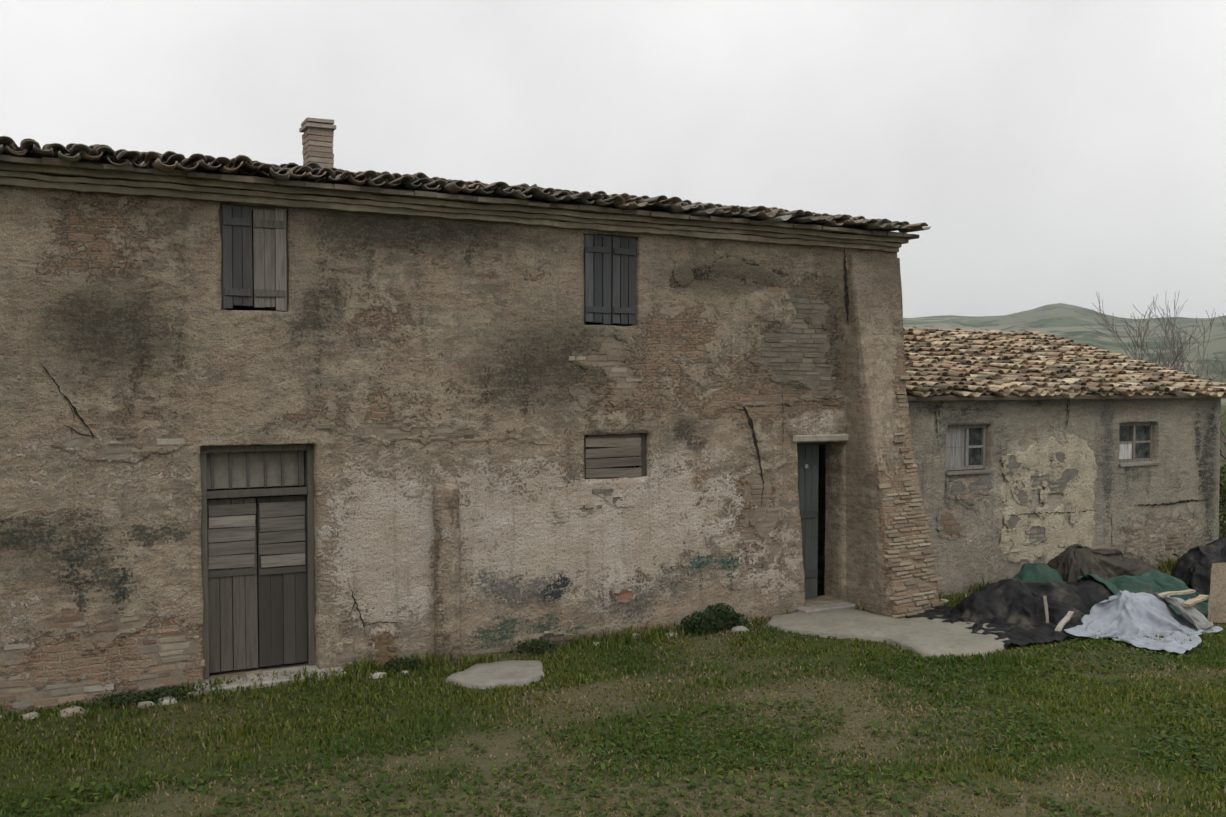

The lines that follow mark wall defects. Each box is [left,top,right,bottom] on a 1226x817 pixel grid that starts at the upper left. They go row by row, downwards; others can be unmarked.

flaking render [735,260,846,407]
crack [39,362,95,437]
damp [123,523,191,546]
crack [719,394,784,506]
flaking render [732,452,790,590]
flaking render [877,424,1098,619]
crack [1135,499,1208,514]
damp [1195,406,1218,542]
damp [66,566,87,612]
flaking render [0,627,205,713]
flaking render [323,609,399,669]
crack [348,581,396,632]